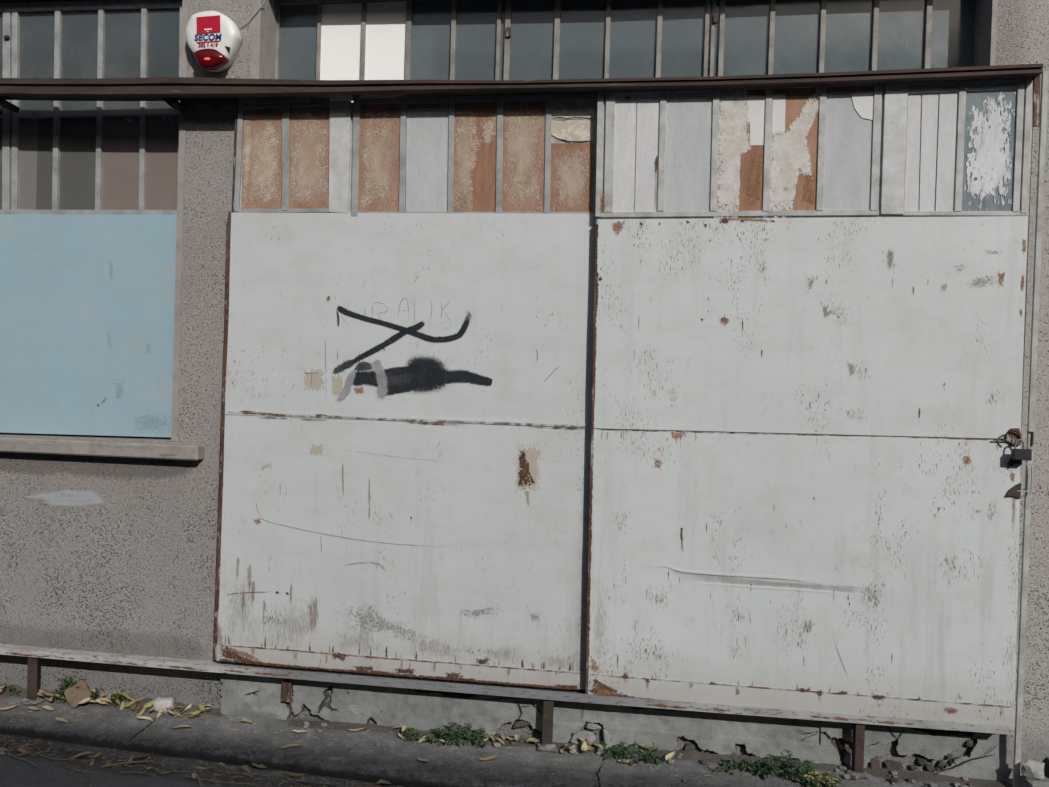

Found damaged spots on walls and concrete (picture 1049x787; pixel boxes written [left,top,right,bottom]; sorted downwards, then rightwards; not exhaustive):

peeling [714,87,820,218]
peeling [964,91,1016,211]
corrosion [217,224,658,610]
corrosion [219,466,730,711]
spalling [317,685,339,713]
crack [486,698,543,720]
corrosion [701,681,885,700]
corrosion [899,698,1012,713]
crack [932,732,998,775]